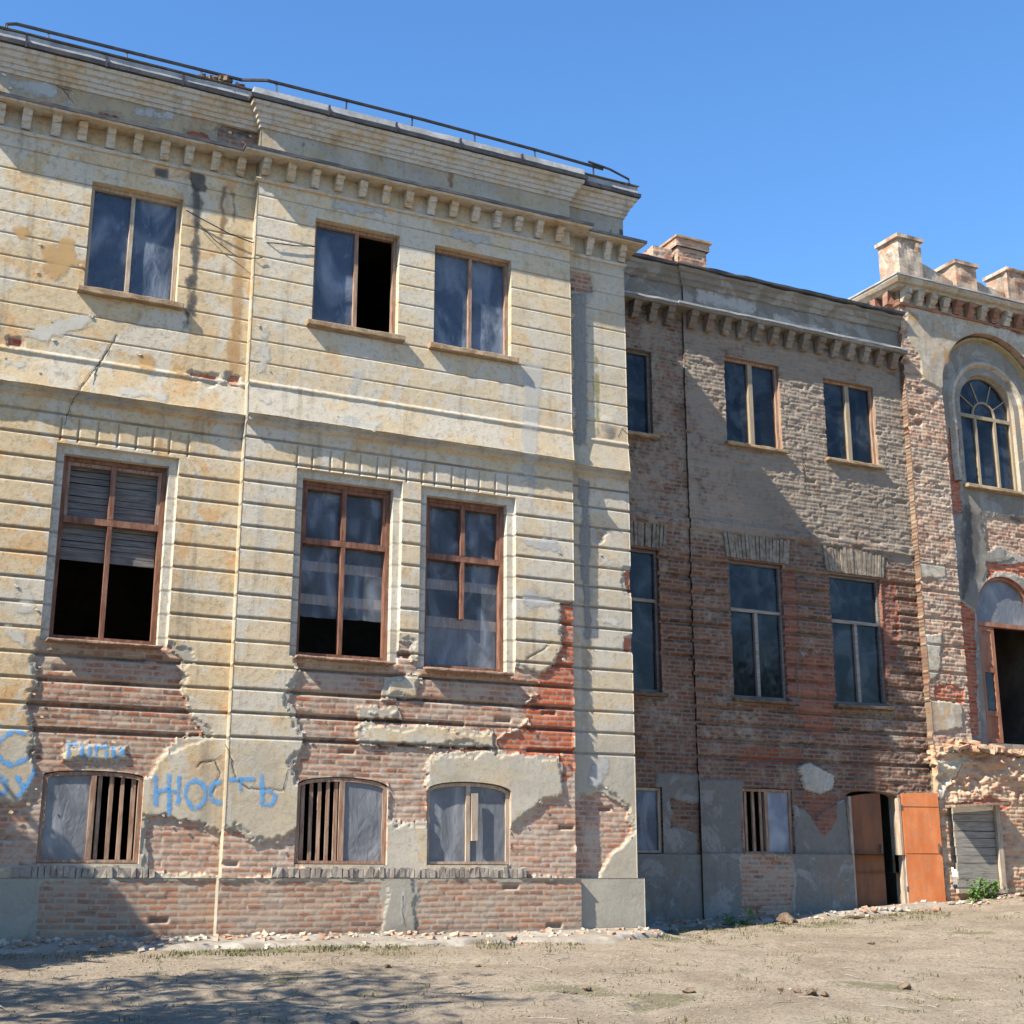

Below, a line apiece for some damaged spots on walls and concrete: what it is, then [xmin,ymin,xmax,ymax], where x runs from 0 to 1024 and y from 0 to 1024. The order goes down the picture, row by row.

water stain [185,185,202,323]
peeling [3,314,93,367]
crack [64,335,117,425]
peeling [118,386,167,402]
peeling [522,532,562,555]
spalling [0,624,205,868]
spalling [287,589,632,934]
spalling [953,795,1012,811]